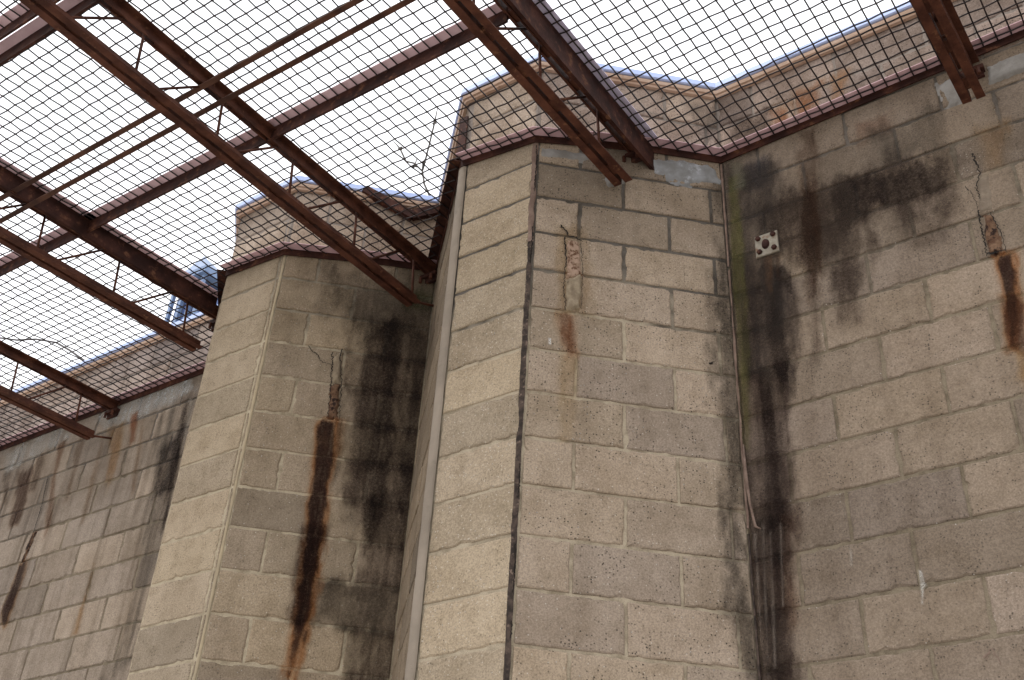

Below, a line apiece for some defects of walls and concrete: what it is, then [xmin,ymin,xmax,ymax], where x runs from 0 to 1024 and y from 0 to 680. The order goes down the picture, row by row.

crack [965,153,1006,256]
corrosion [997,254,1021,343]
crack [309,346,343,415]
corrosion [287,419,335,675]